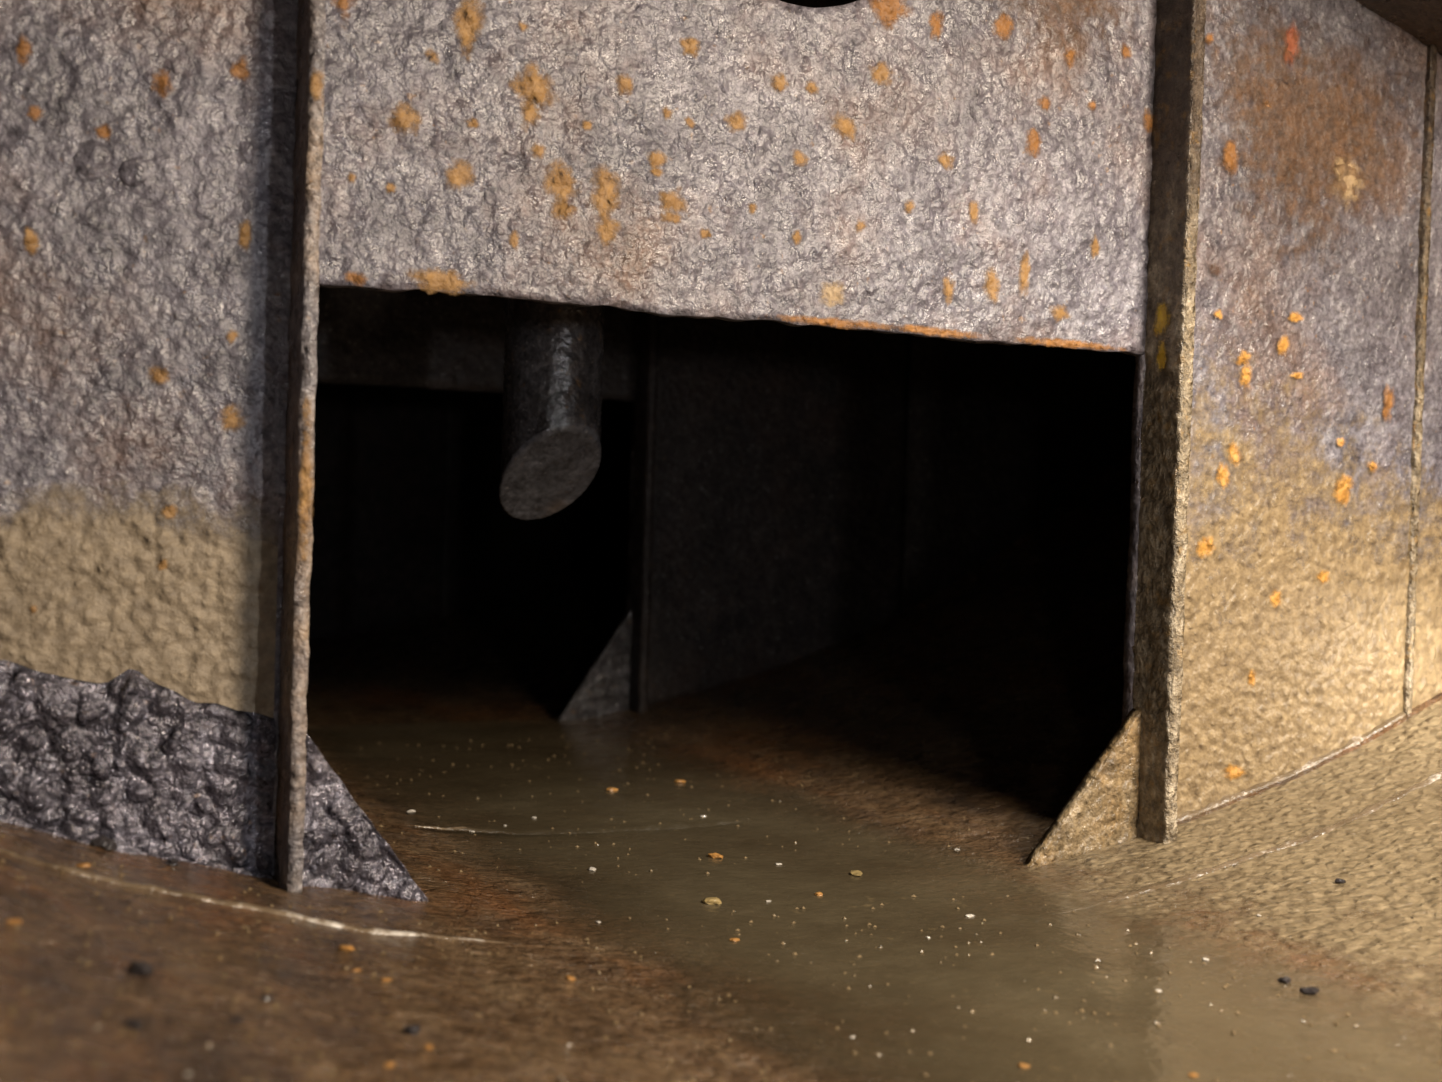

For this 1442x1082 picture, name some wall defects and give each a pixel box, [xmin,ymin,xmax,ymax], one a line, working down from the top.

rust [871,0,907,27]
rust [512,65,551,122]
rust [533,145,576,218]
rust [593,169,619,242]
rust [650,152,685,223]
rust [1336,159,1358,198]
rust [409,270,467,292]
rust [784,284,884,329]
rust [903,324,975,338]
rust [1238,351,1251,384]
rust [1278,337,1289,353]
rust [1177,398,1442,817]